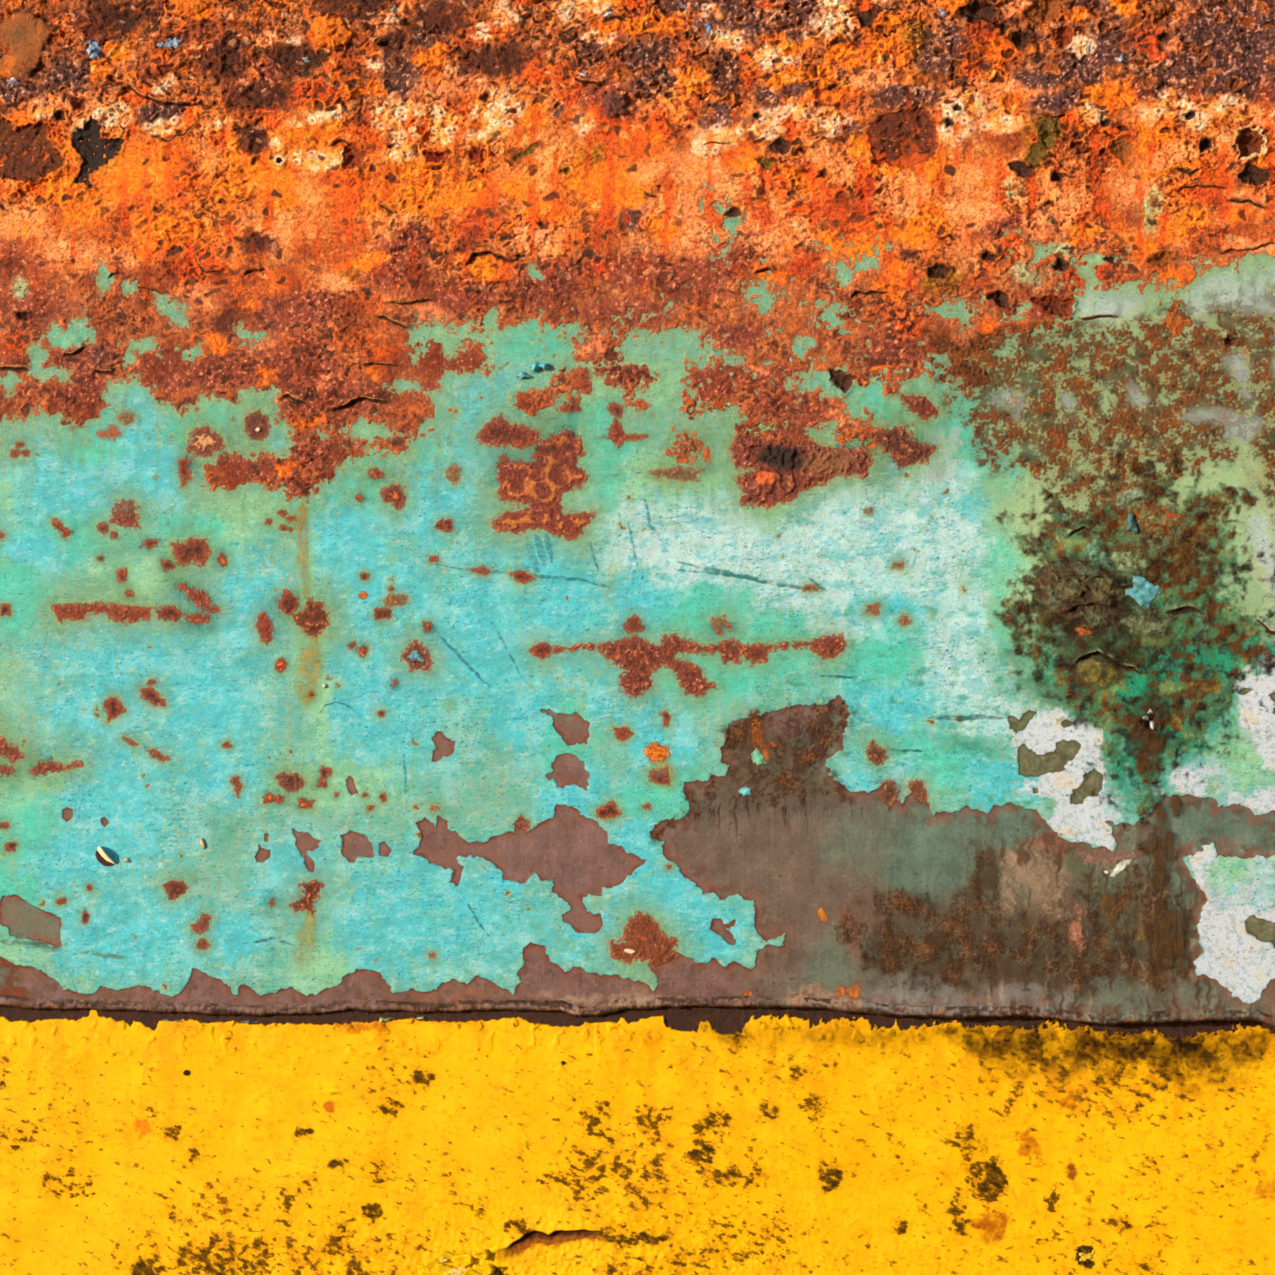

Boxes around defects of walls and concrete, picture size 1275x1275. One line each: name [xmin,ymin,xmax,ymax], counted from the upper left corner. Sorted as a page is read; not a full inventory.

rust [0,0,1275,586]
rust [49,499,228,626]
rust [529,614,846,698]
rust [0,733,86,777]
peeling [0,695,1275,1019]
rust [0,850,1275,1040]
crack [505,1230,600,1256]